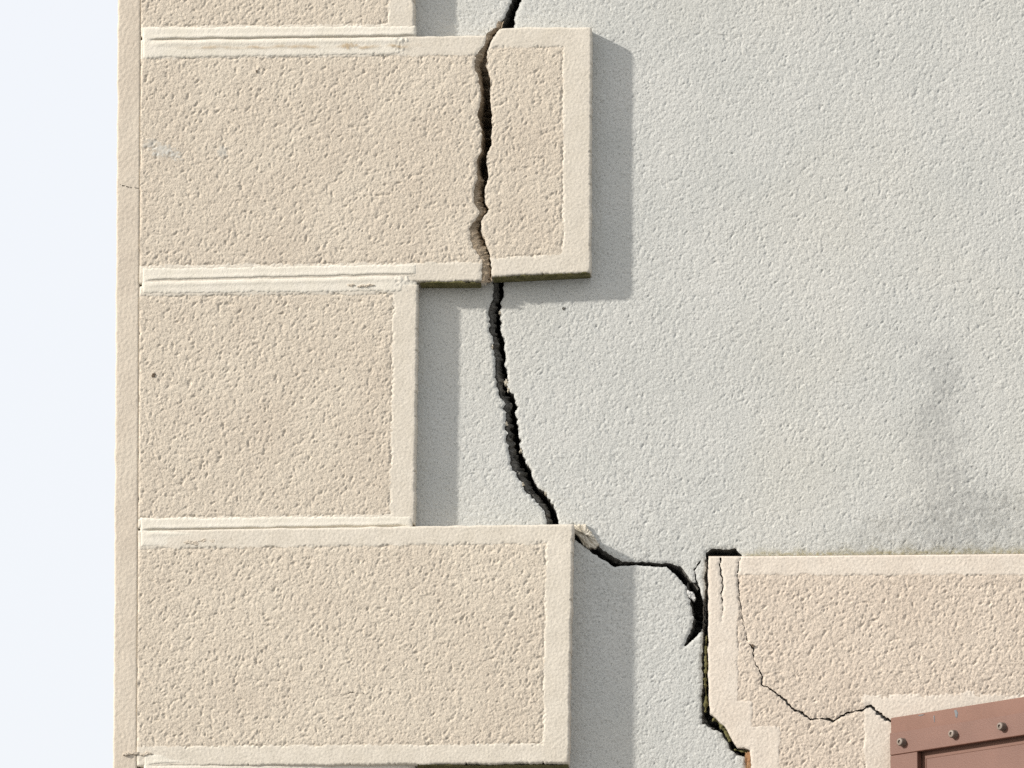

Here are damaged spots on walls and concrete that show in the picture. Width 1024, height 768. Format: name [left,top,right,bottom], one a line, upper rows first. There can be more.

crack [469,0,891,766]